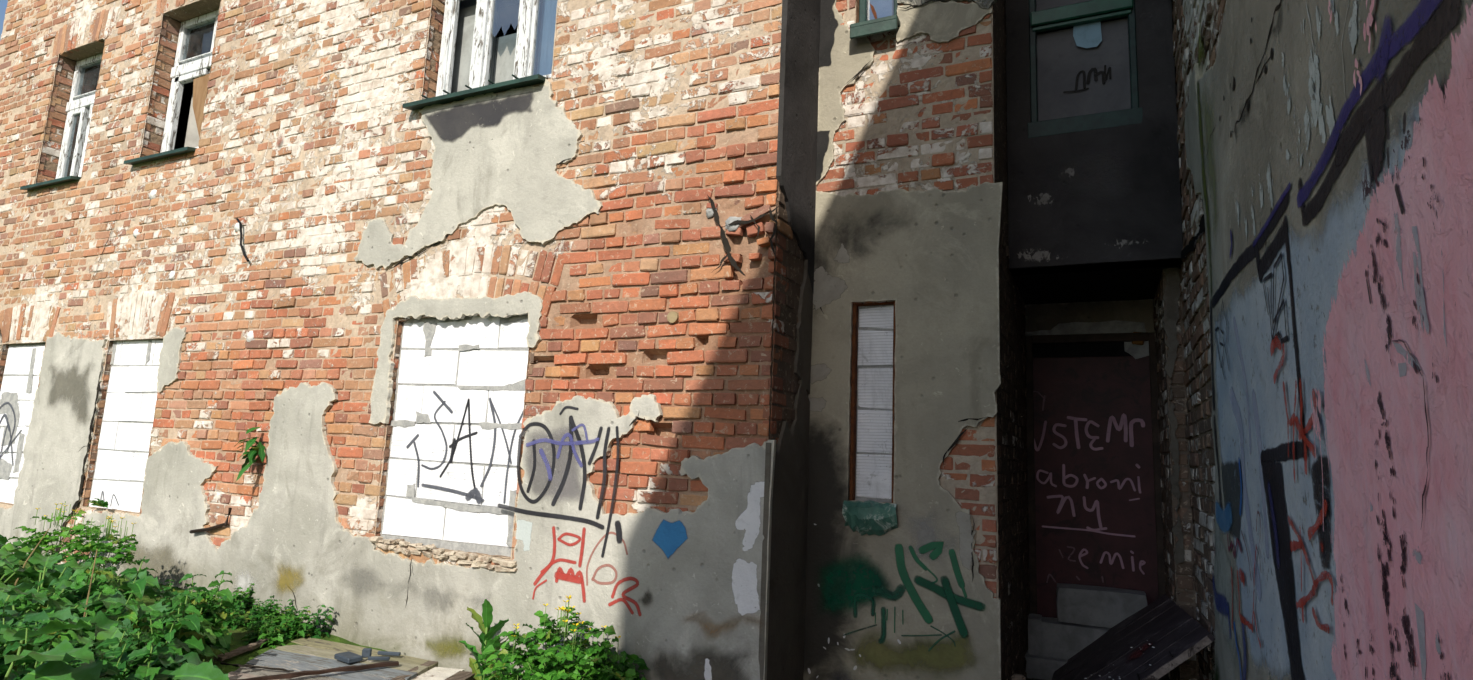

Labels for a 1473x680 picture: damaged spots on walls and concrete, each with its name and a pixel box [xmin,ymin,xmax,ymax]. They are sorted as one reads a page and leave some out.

flaking render [0,0,1003,680]
flaking render [1025,320,1149,359]
flaking render [1172,0,1242,680]
crack [1205,0,1349,159]